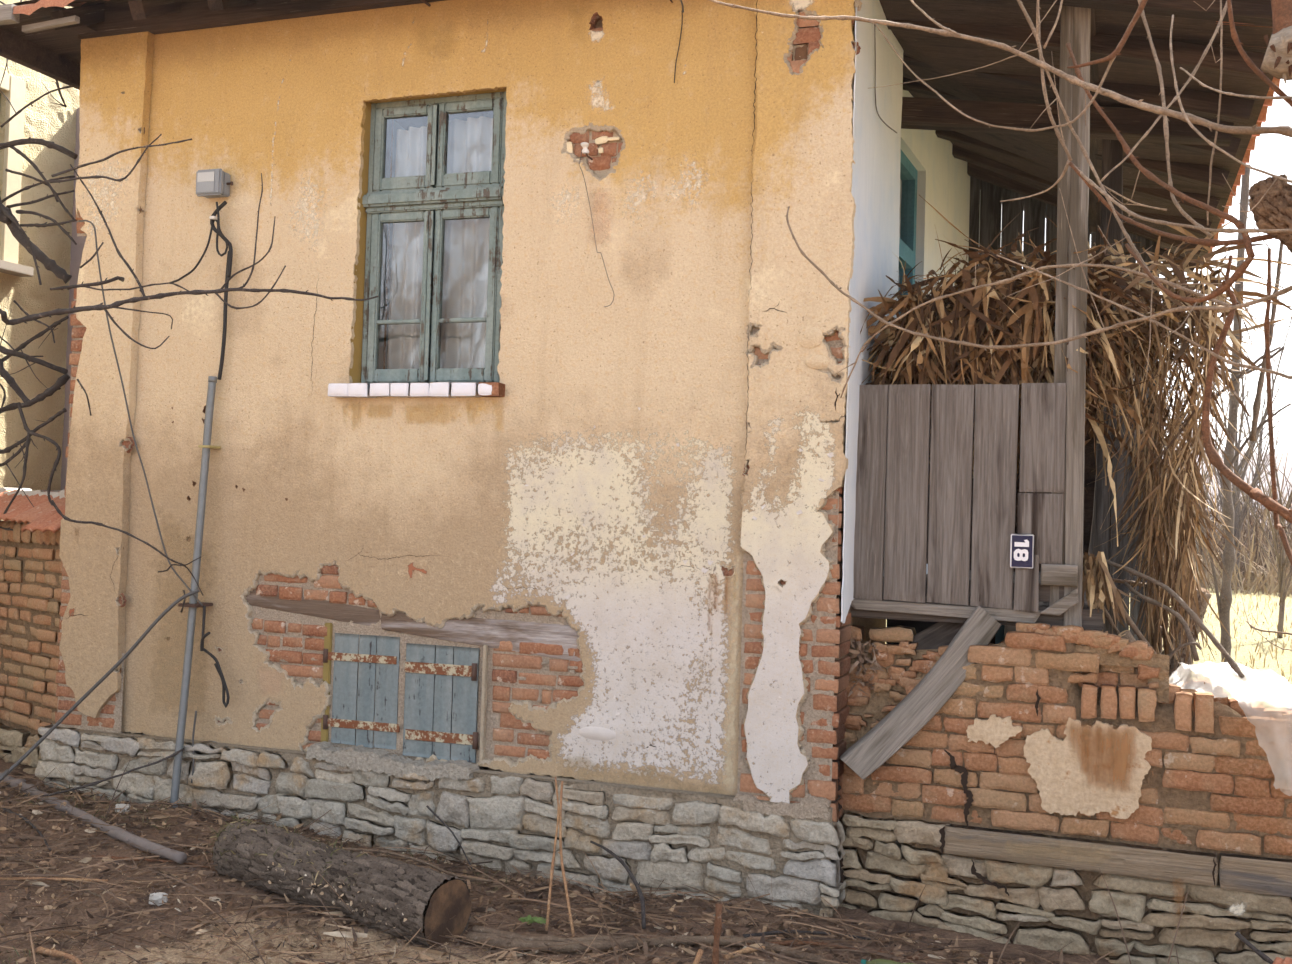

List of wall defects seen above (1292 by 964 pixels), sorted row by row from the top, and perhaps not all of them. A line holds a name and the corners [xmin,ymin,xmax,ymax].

spalling [783,0,824,75]
spalling [561,80,626,181]
crack [745,0,787,460]
peeling [240,406,851,822]
crack [939,750,1009,896]